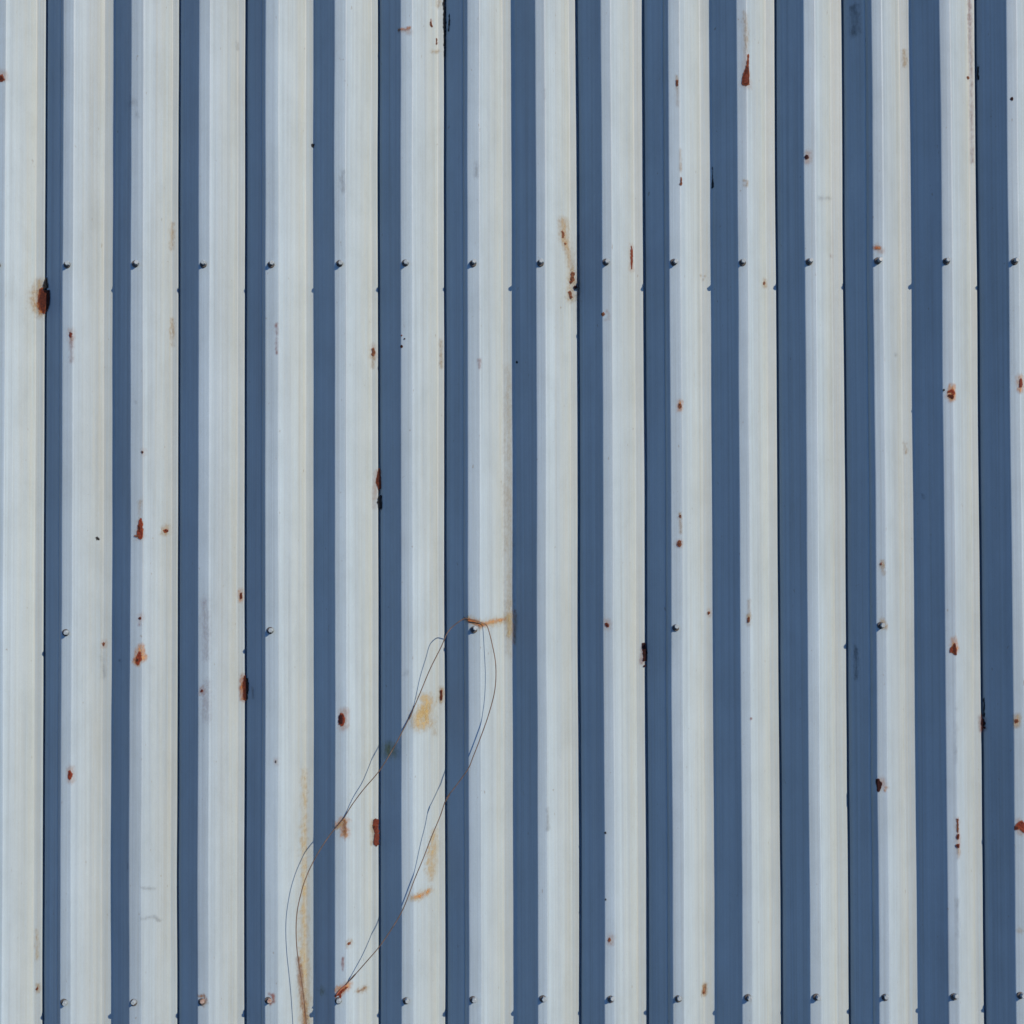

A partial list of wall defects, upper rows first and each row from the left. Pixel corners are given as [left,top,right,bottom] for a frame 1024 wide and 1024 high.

corrosion [742,54,750,86]
corrosion [32,278,50,315]
corrosion [134,518,144,539]
corrosion [134,645,147,665]
corrosion [240,675,249,700]